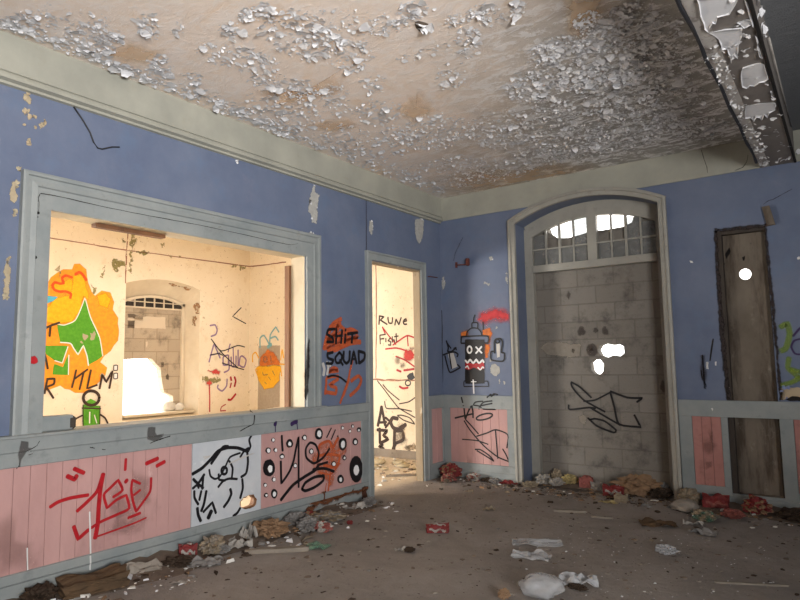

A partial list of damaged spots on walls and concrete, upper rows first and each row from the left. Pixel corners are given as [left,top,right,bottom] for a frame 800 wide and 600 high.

peeling [0,0,800,193]
peeling [10,166,22,217]
peeling [308,185,319,234]
peeling [415,218,424,243]
peeling [2,256,11,300]